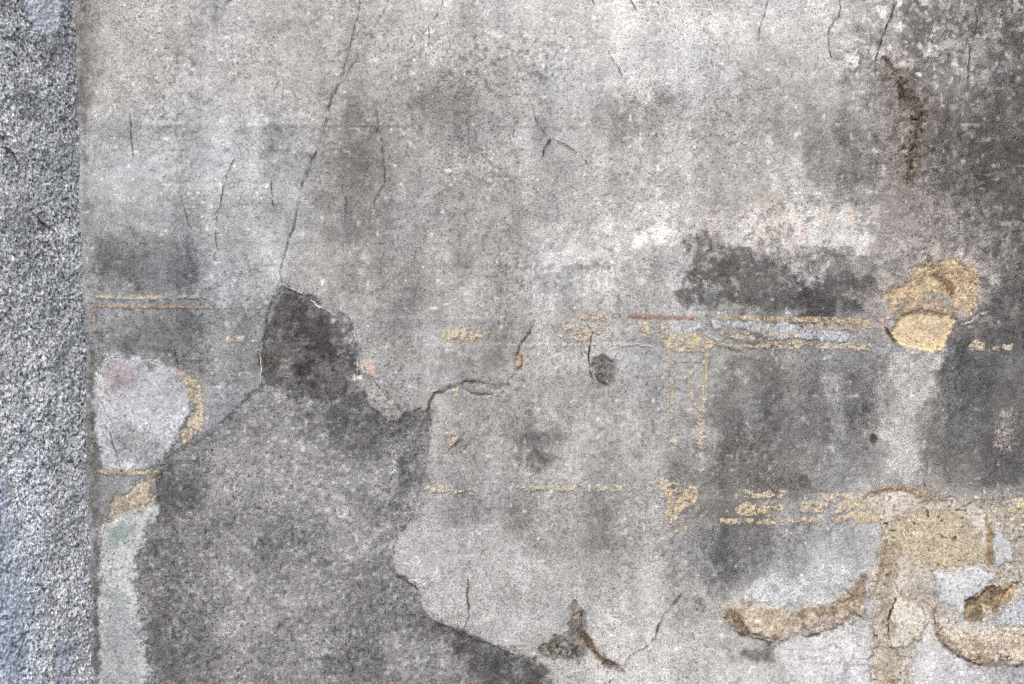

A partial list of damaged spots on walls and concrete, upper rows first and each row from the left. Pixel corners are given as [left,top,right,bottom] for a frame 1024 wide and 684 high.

crack [263,1,387,361]
damp [674,0,1024,490]
damp [257,286,384,448]
crack [427,324,534,420]
spalling [530,257,989,449]
peeling [969,340,1013,350]
damp [388,516,602,655]
spalling [538,600,623,671]
spalling [720,479,1024,684]